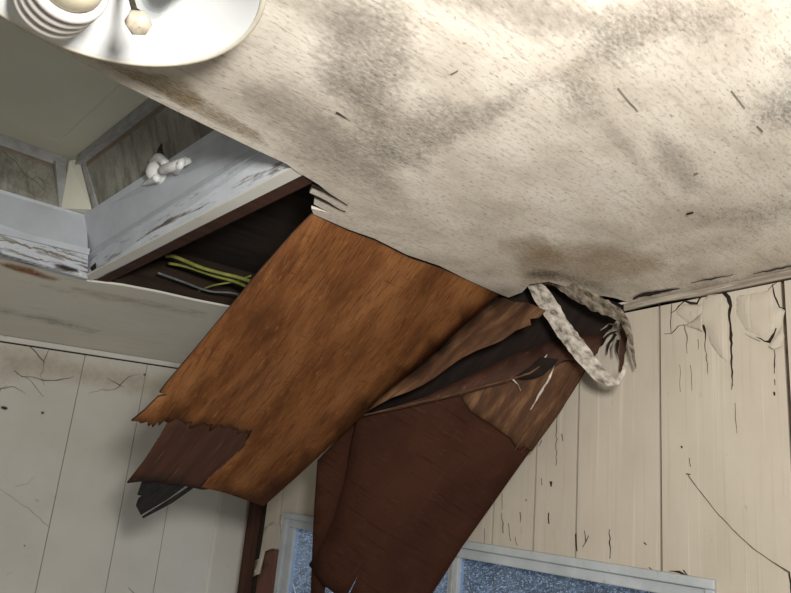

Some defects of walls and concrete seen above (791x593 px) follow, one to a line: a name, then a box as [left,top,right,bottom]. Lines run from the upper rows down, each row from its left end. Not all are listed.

crack [0,345,72,397]
peeling [460,360,584,452]
peeling [769,327,785,349]
peeling [253,511,289,593]